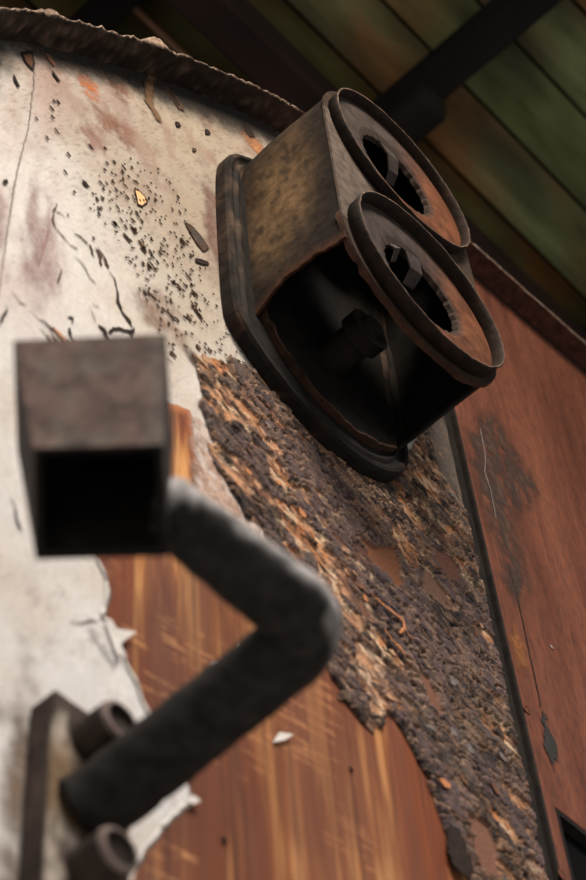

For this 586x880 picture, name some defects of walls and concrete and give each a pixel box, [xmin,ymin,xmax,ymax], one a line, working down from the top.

crack [0,54,42,325]
crack [52,204,135,336]
peeling [73,157,246,364]
peeling [171,404,269,540]
peeling [96,555,255,714]
corrosion [372,593,406,655]
peeling [133,667,469,880]
peeling [539,705,559,765]